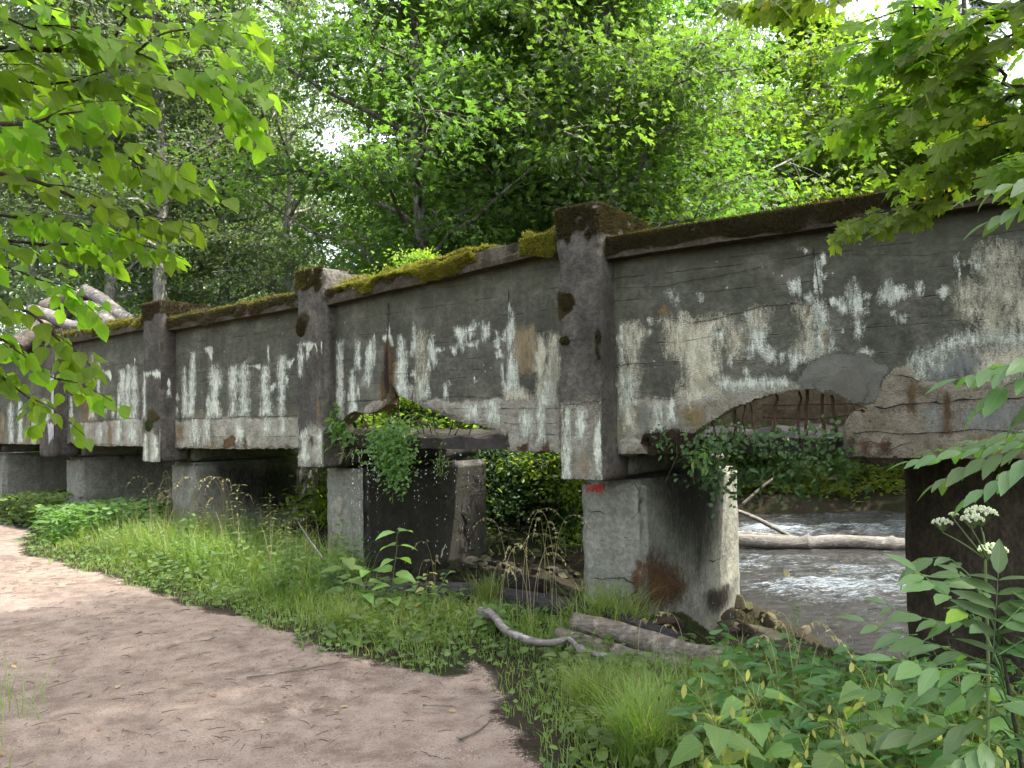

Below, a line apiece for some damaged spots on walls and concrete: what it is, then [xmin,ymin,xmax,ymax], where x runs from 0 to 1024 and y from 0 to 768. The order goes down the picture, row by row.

efflorescence [88,341,322,423]
spalling [362,398,387,414]
efflorescence [336,304,561,418]
spalling [619,382,804,457]
efflorescence [616,243,1024,419]
corrosion [631,552,688,614]